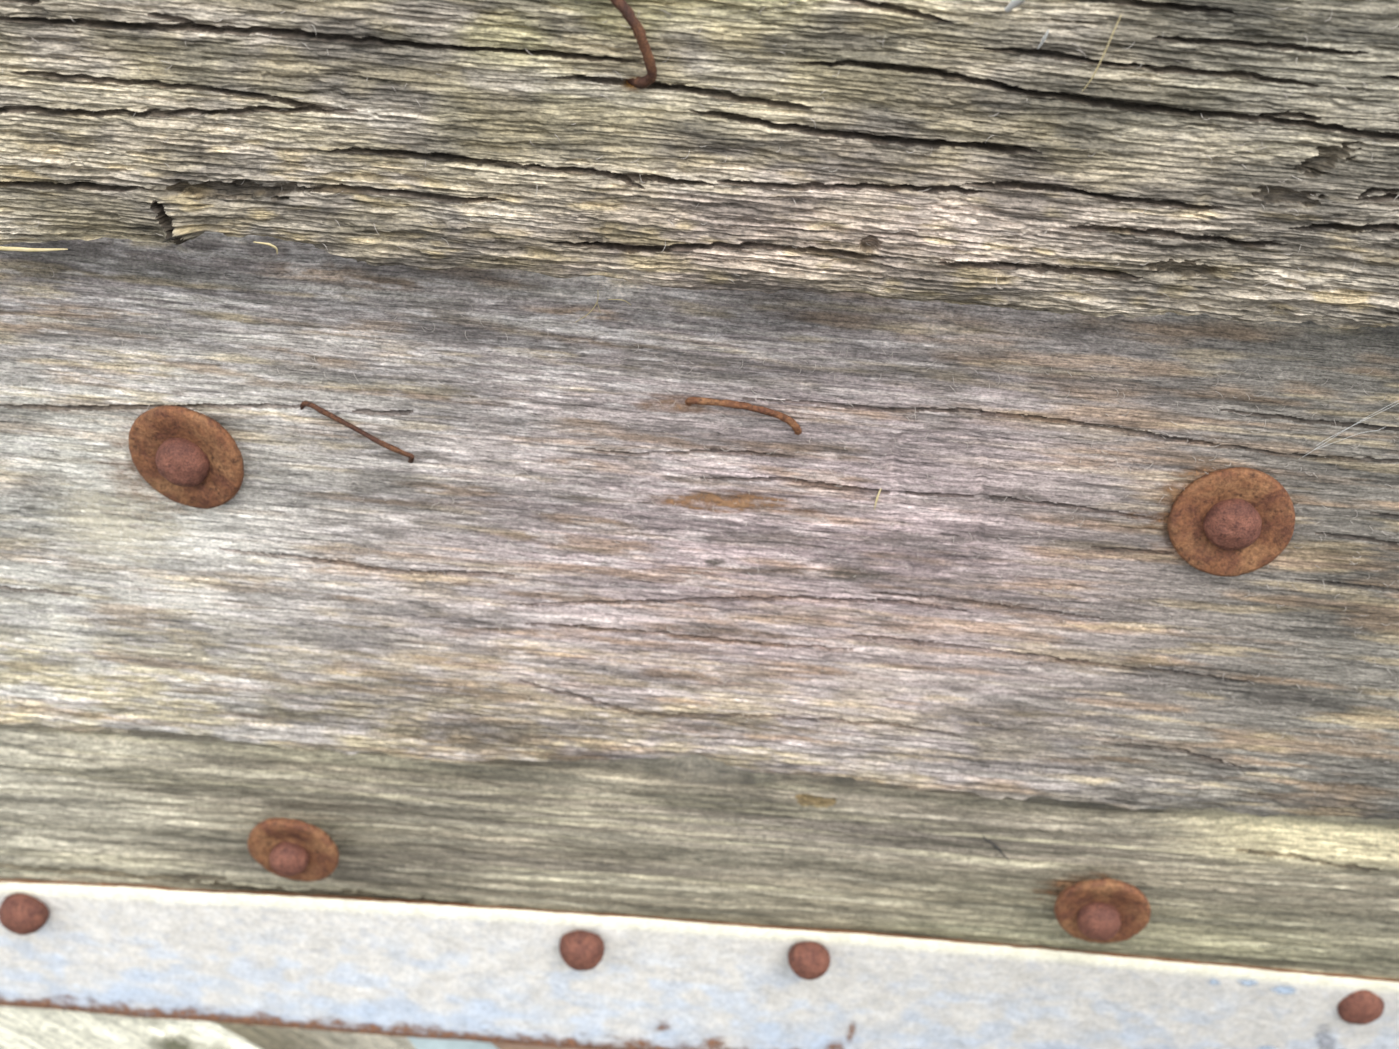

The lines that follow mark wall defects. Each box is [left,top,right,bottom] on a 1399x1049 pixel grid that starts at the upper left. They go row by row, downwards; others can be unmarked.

crack [0,0,1399,248]
crack [547,241,890,260]
crack [935,260,1143,281]
crack [0,402,300,412]
crack [1294,578,1399,594]
crack [219,547,1254,683]
crack [519,679,962,737]
crack [1100,742,1258,771]
crack [1235,848,1385,873]
crack [0,862,469,904]
corrosion [0,996,730,1049]